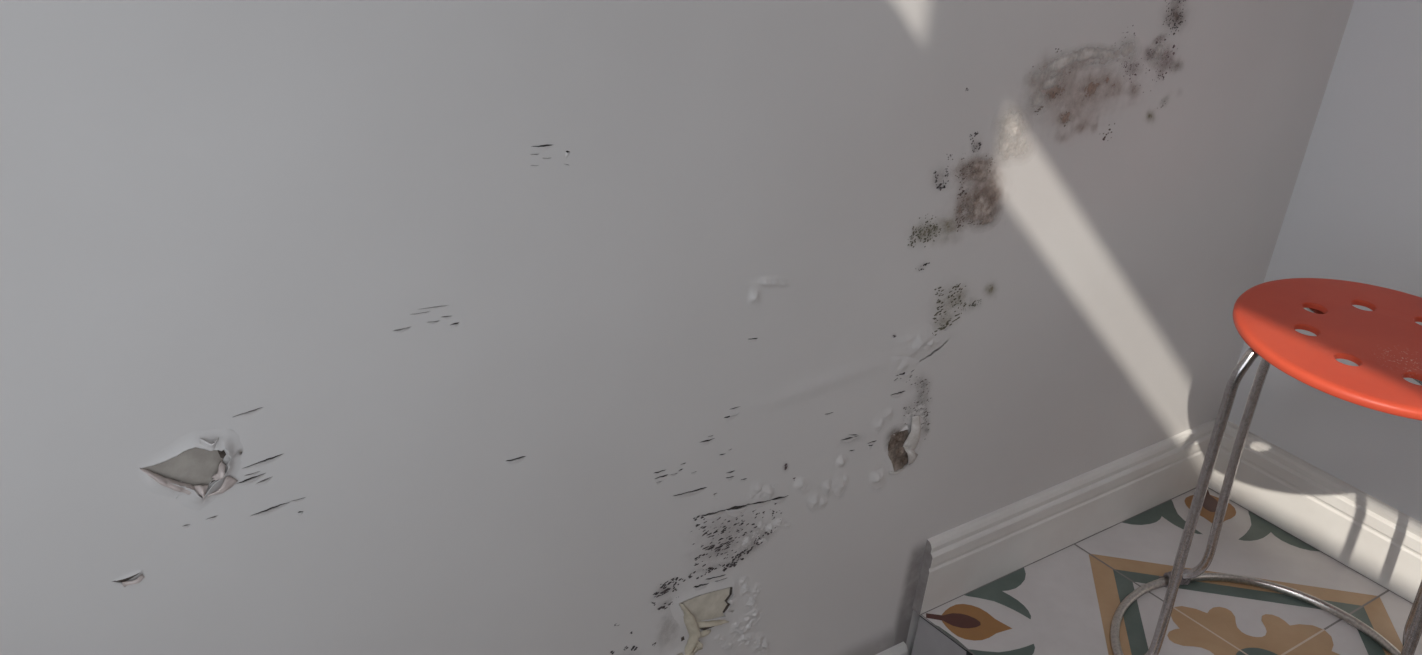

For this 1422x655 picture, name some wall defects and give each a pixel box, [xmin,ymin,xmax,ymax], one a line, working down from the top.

damp [1032,0,1186,128]
damp [907,131,997,271]
damp [932,283,993,336]
peeling [132,428,244,511]
flaking render [881,389,929,476]
damp [652,503,781,610]
peeling [651,573,742,655]